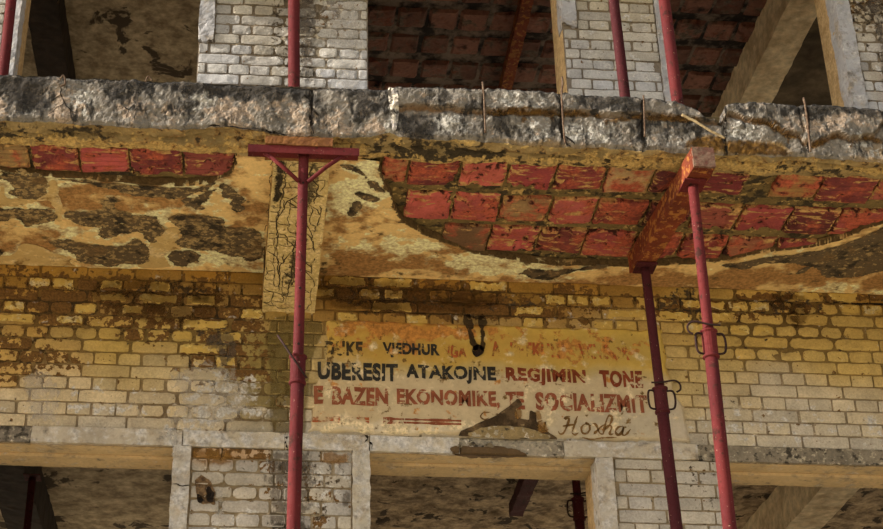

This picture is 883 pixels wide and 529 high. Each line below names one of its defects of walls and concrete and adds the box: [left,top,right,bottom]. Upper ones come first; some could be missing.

leakage [3,76,55,116]
leakage [173,81,282,104]
spalling [681,113,726,139]
crack [721,106,729,156]
crack [804,105,812,153]
spalling [0,144,265,267]
spalling [340,156,677,280]
spalling [659,172,883,278]
peeling [0,301,33,323]
peeling [29,278,74,290]
peeling [56,280,215,324]
peeling [173,319,241,367]